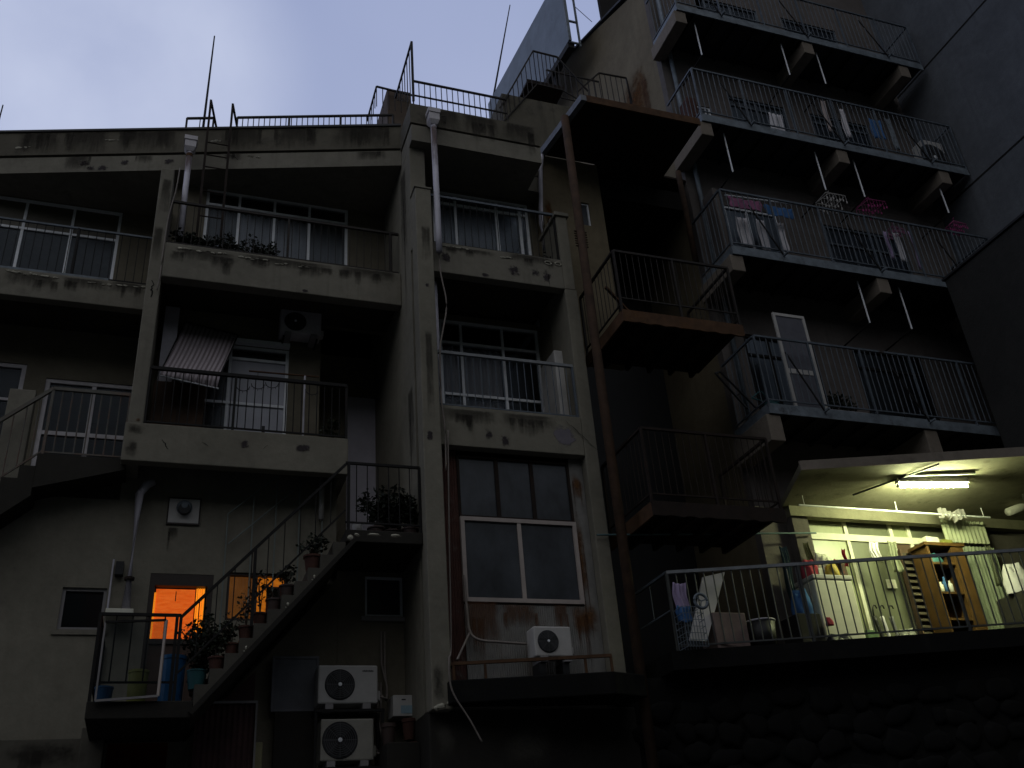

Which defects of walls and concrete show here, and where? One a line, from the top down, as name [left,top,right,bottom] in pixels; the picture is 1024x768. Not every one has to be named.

leakage [24,133,104,145]
rust [468,602,538,644]